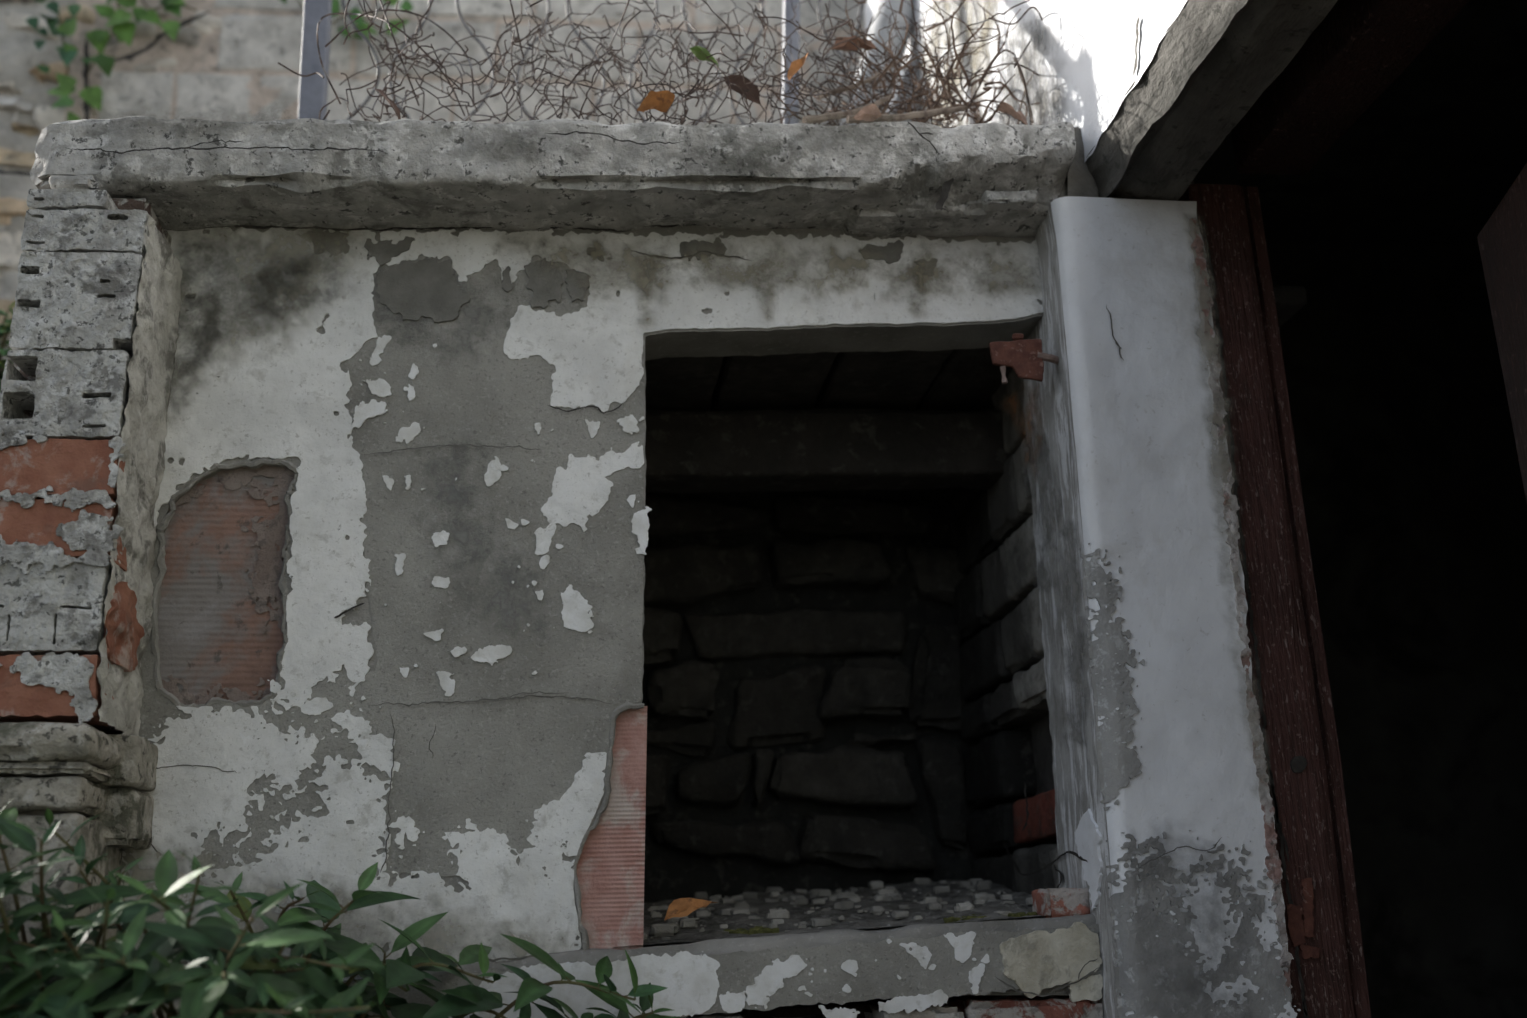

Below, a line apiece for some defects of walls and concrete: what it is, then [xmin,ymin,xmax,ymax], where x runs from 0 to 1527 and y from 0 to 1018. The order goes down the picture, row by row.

peeling [104,218,1301,1018]